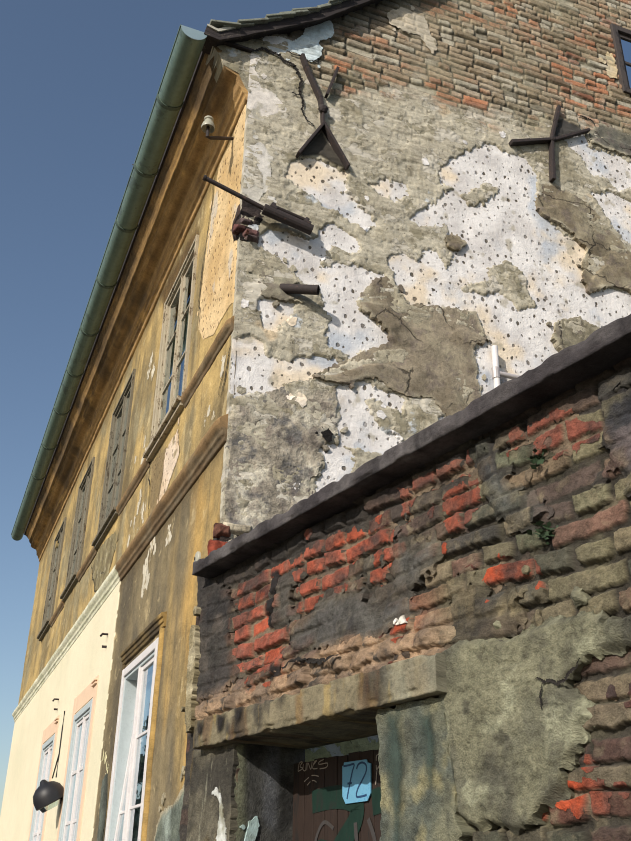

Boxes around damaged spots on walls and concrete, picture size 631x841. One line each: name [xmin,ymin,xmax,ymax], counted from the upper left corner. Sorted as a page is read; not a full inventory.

crack [237,47,321,126]
flaking render [197,105,631,555]
spalling [232,450,483,687]
spalling [482,551,552,626]
spalling [606,682,631,708]
peeling [212,787,227,841]
peeling [240,816,259,841]
spalling [555,754,631,821]